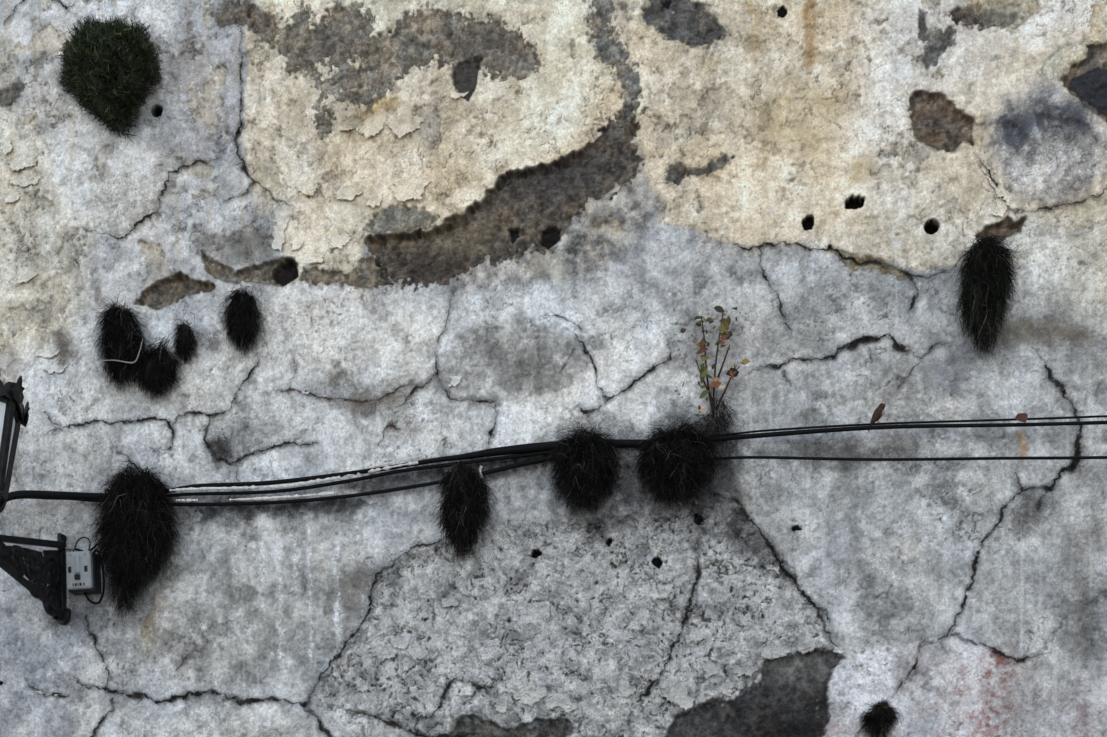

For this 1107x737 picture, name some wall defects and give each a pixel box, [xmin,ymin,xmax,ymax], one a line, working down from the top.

spalling [135,0,646,310]
spalling [643,0,726,47]
spalling [909,89,1027,243]
spalling [1038,3,1107,122]
crack [43,289,498,482]
crack [549,314,672,414]
crack [726,237,955,387]
crack [896,347,1082,692]
crack [25,538,444,737]
crack [347,675,486,737]
spalling [305,502,844,737]
crack [628,520,702,725]